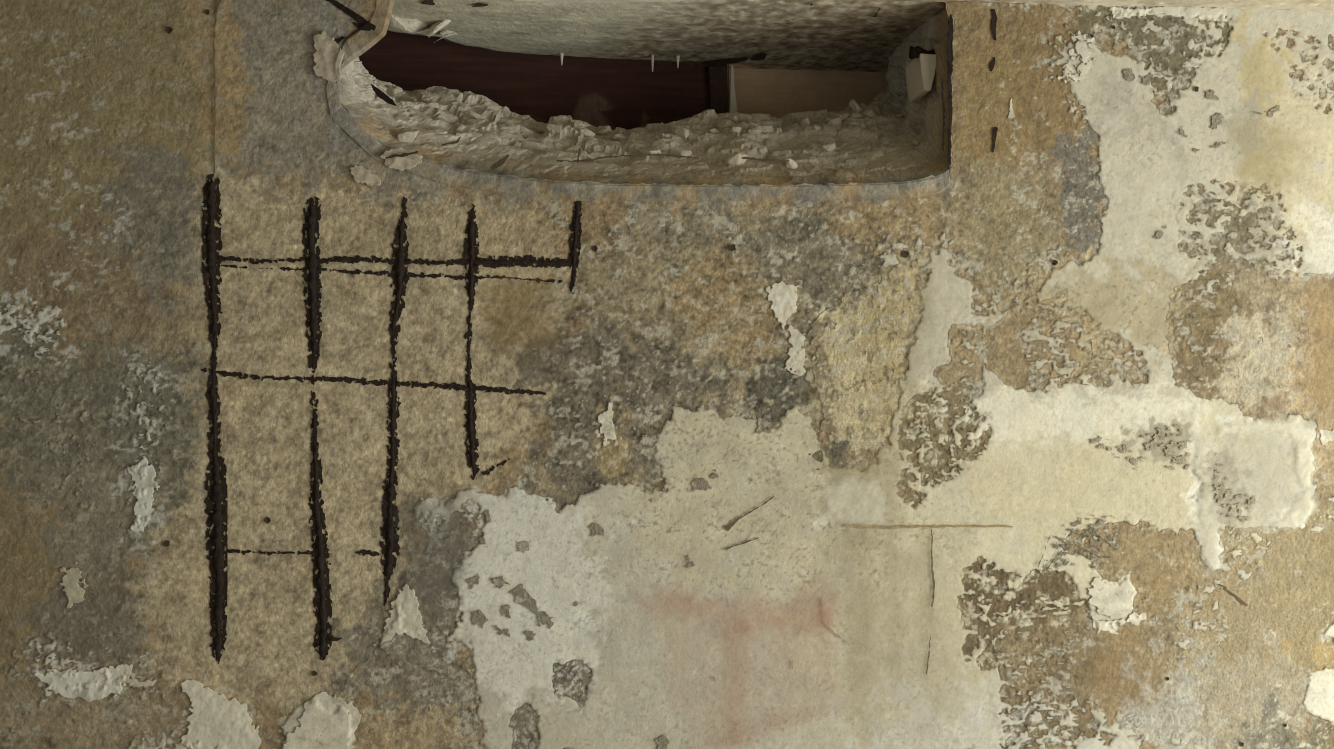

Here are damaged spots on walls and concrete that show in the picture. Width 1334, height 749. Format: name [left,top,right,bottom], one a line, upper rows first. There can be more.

peeling [335,0,376,21]
spalling [909,46,935,59]
peeling [1123,68,1135,82]
peeling [1210,113,1224,129]
peeling [957,179,1334,749]
peeling [691,470,719,492]
peeling [897,465,926,509]
peeling [589,522,604,537]
peeling [491,576,554,641]
peeling [471,610,510,637]
peeling [552,660,593,707]
peeling [510,703,540,749]